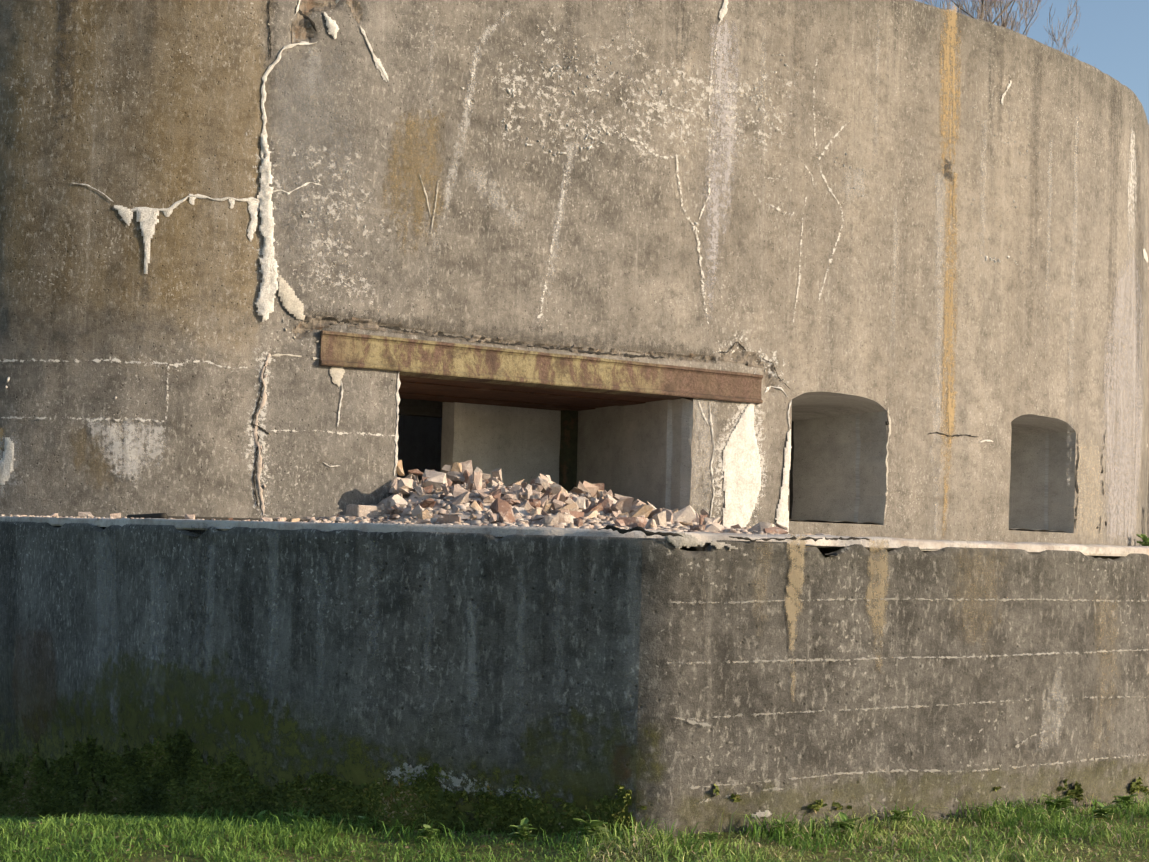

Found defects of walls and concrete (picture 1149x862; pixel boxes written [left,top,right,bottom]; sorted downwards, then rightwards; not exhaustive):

crack [72,0,384,322]
spalling [290,0,389,82]
efflorescence [483,20,802,173]
crack [676,0,741,324]
crack [793,60,867,322]
corrosion [940,5,961,530]
efflorescence [88,420,165,480]
crack [0,353,345,506]
flaking render [283,315,792,534]
damp [785,534,806,650]
damp [866,539,889,634]